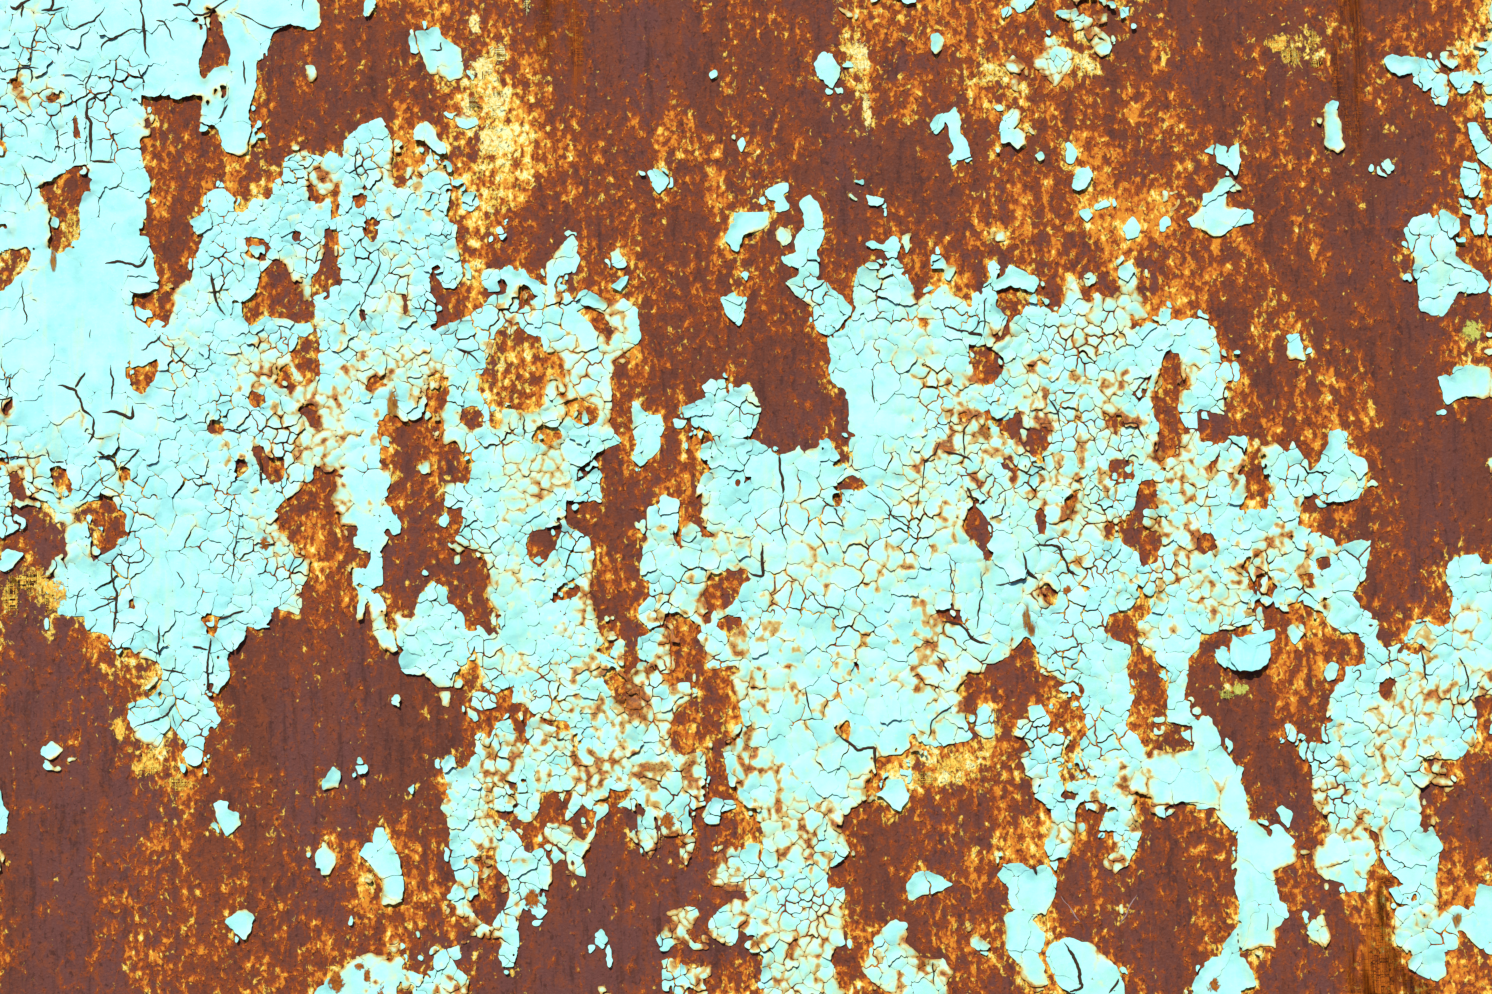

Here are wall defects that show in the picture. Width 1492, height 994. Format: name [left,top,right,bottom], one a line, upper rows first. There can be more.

crack [0,0,304,204]
peeling [1384,40,1492,316]
crack [10,365,139,501]
peeling [0,0,736,967]
corrosion [387,390,399,415]
corrosion [0,565,68,617]
crack [75,516,253,728]
corrosion [204,613,221,631]
crack [928,544,1080,738]
peeling [638,195,1492,994]
corrosion [328,963,384,994]
peeling [314,941,469,994]